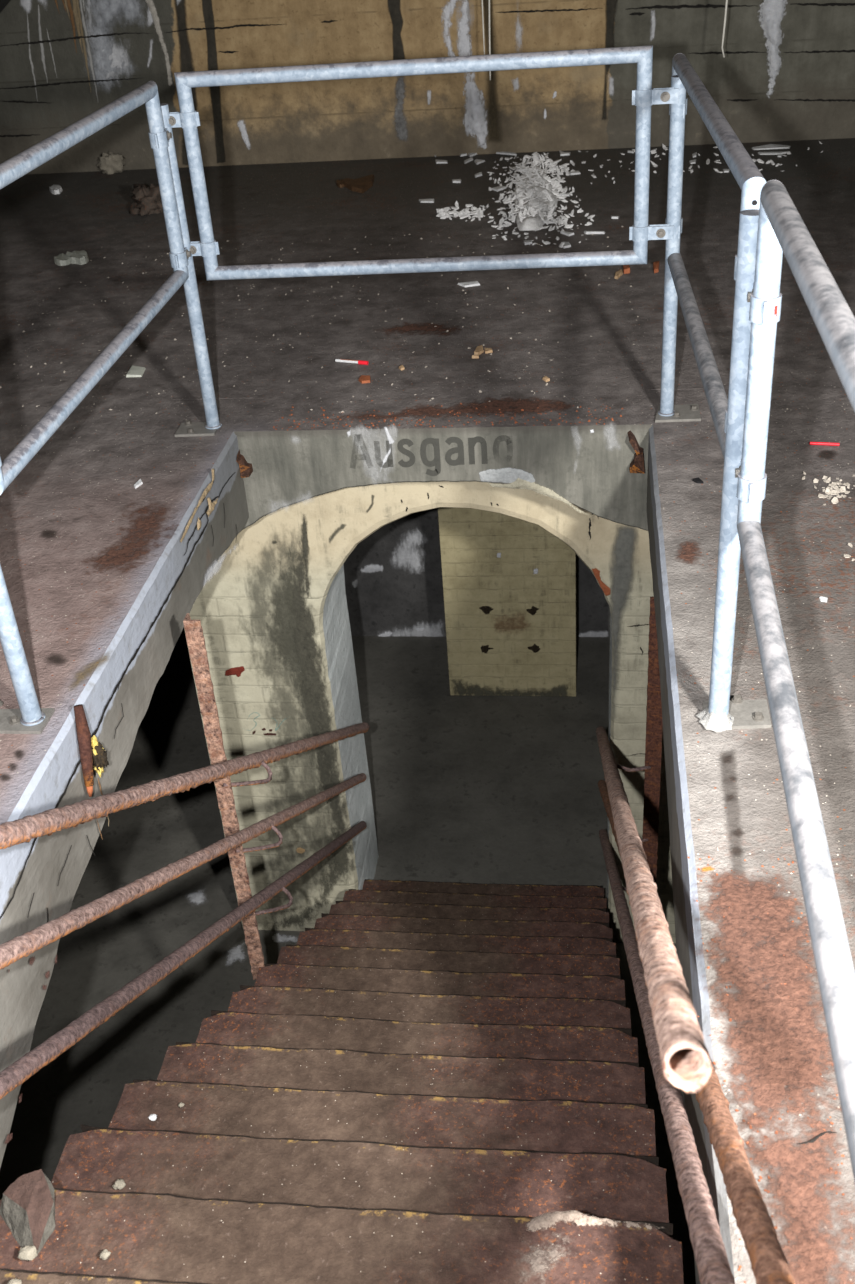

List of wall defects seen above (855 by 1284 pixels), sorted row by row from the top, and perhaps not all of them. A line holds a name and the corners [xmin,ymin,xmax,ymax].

leakage [88,0,250,163]
leakage [388,0,405,60]
leakage [394,76,408,140]
leakage [441,0,495,57]
leakage [463,71,500,149]
leakage [759,0,788,95]
spalling [479,468,584,513]
corrosion [83,506,169,574]
leakage [252,518,355,942]
leakage [188,893,204,904]
leakage [227,946,244,964]
corrosion [701,867,855,1284]